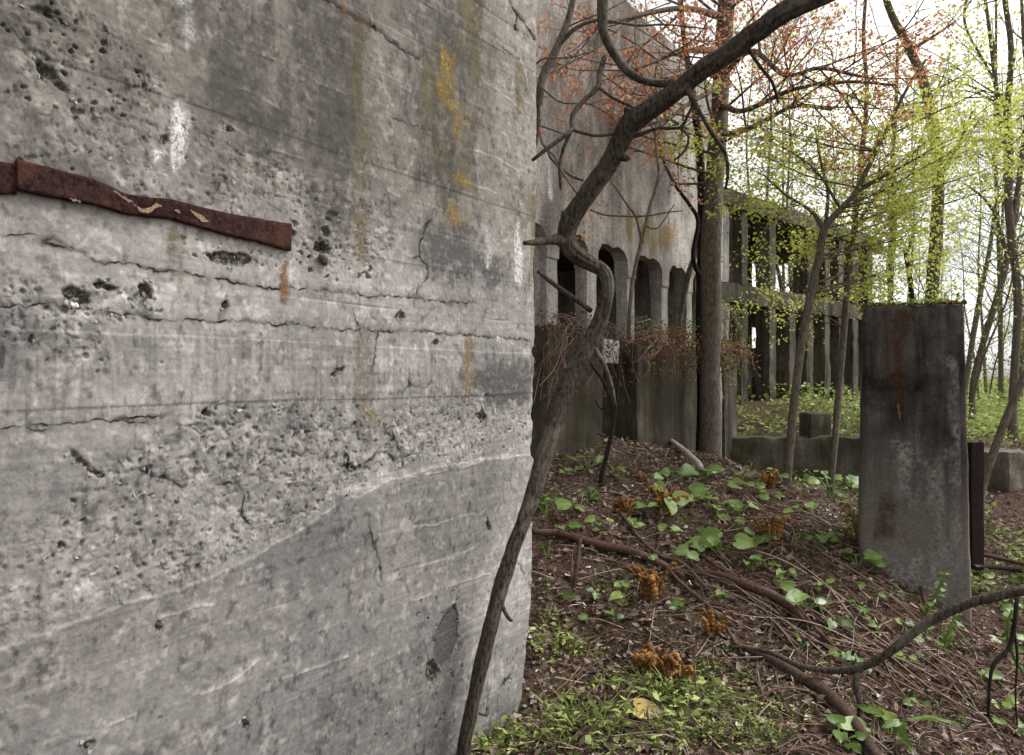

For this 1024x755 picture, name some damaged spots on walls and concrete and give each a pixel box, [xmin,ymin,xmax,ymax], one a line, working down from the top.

leakage [152,101,190,172]
leakage [407,0,547,289]
spalling [205,247,261,269]
crack [0,220,528,365]
rust [280,265,288,303]
crack [1,415,166,431]